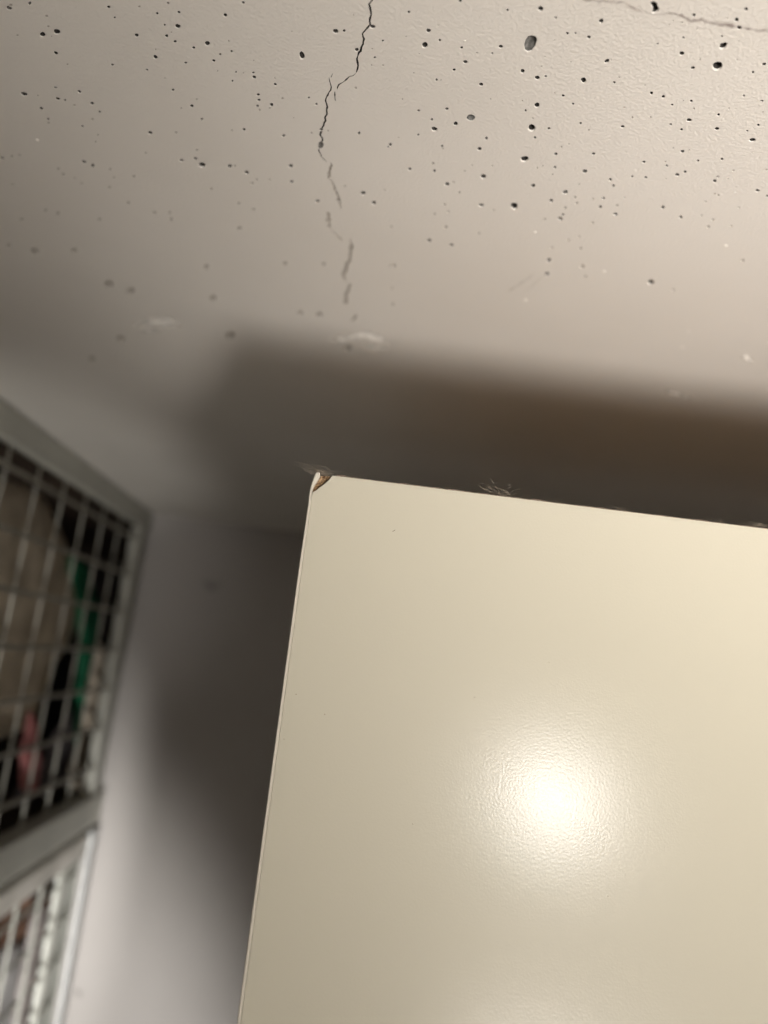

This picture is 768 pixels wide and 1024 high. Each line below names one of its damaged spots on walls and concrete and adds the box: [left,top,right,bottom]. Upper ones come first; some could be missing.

crack [318,0,376,321]